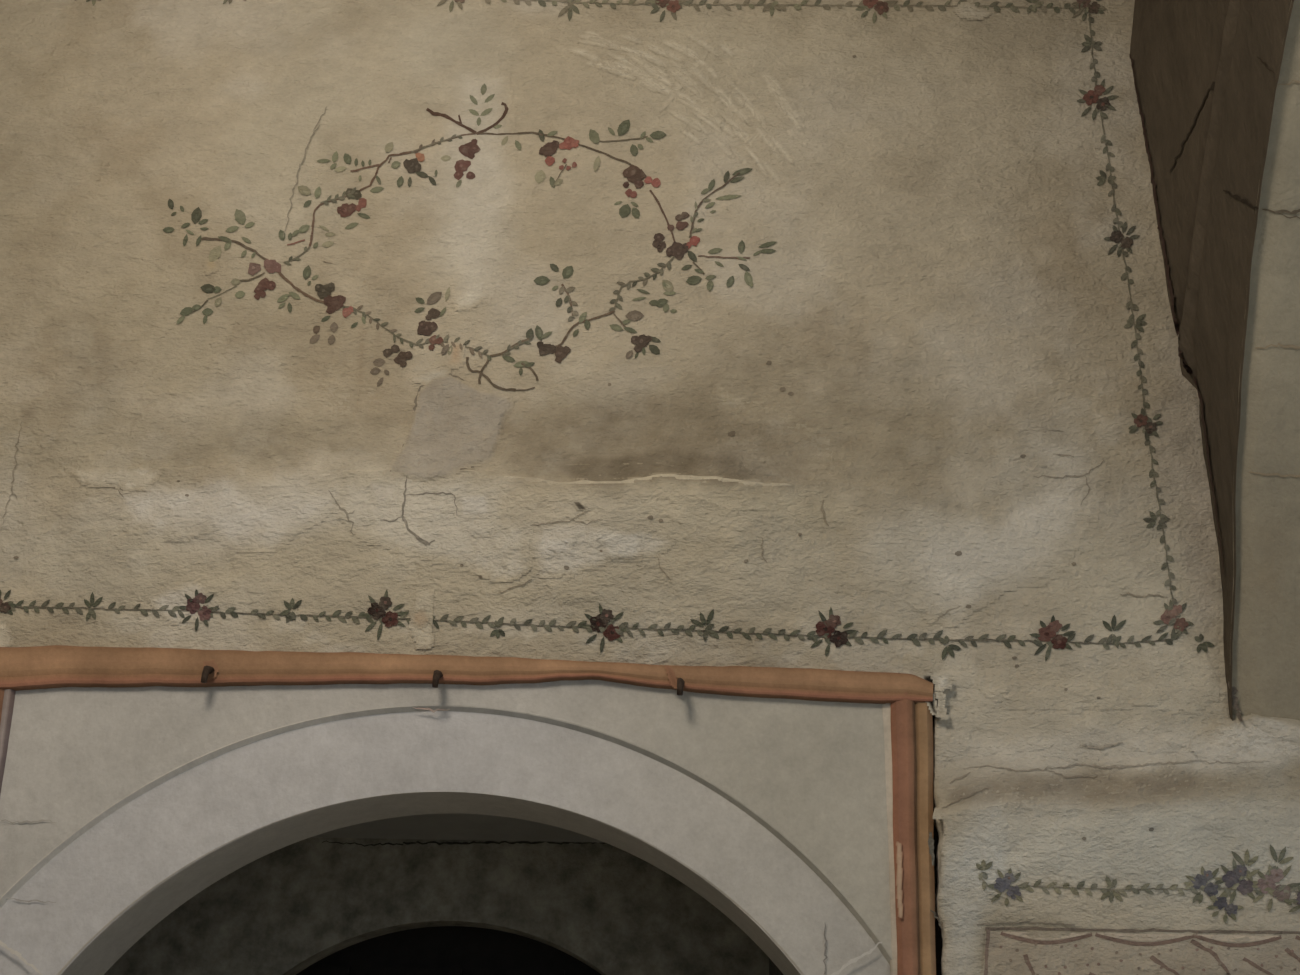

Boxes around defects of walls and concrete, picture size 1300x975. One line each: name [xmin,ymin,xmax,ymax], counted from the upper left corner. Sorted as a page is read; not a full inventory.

crack [1223,190,1300,219]
water stain [0,177,447,487]
crack [413,373,465,412]
water stain [477,271,1035,543]
crack [329,491,355,534]
crack [385,444,474,545]
crack [928,742,1269,975]